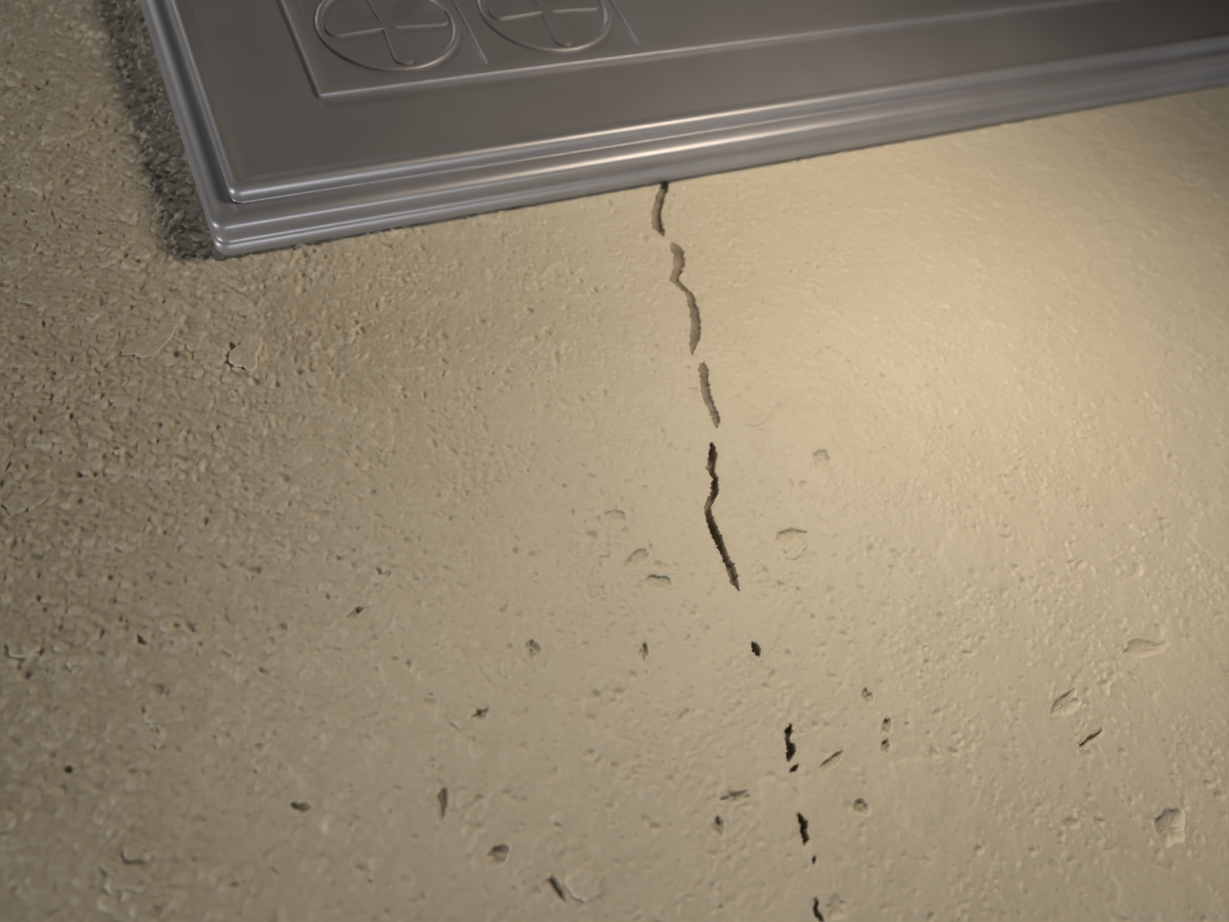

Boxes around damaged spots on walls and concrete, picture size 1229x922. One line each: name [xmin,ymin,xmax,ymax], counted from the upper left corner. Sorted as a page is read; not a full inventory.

crack [649,181,742,592]
crack [749,640,763,658]
crack [782,724,801,774]
crack [795,811,819,864]
crack [810,899,826,922]